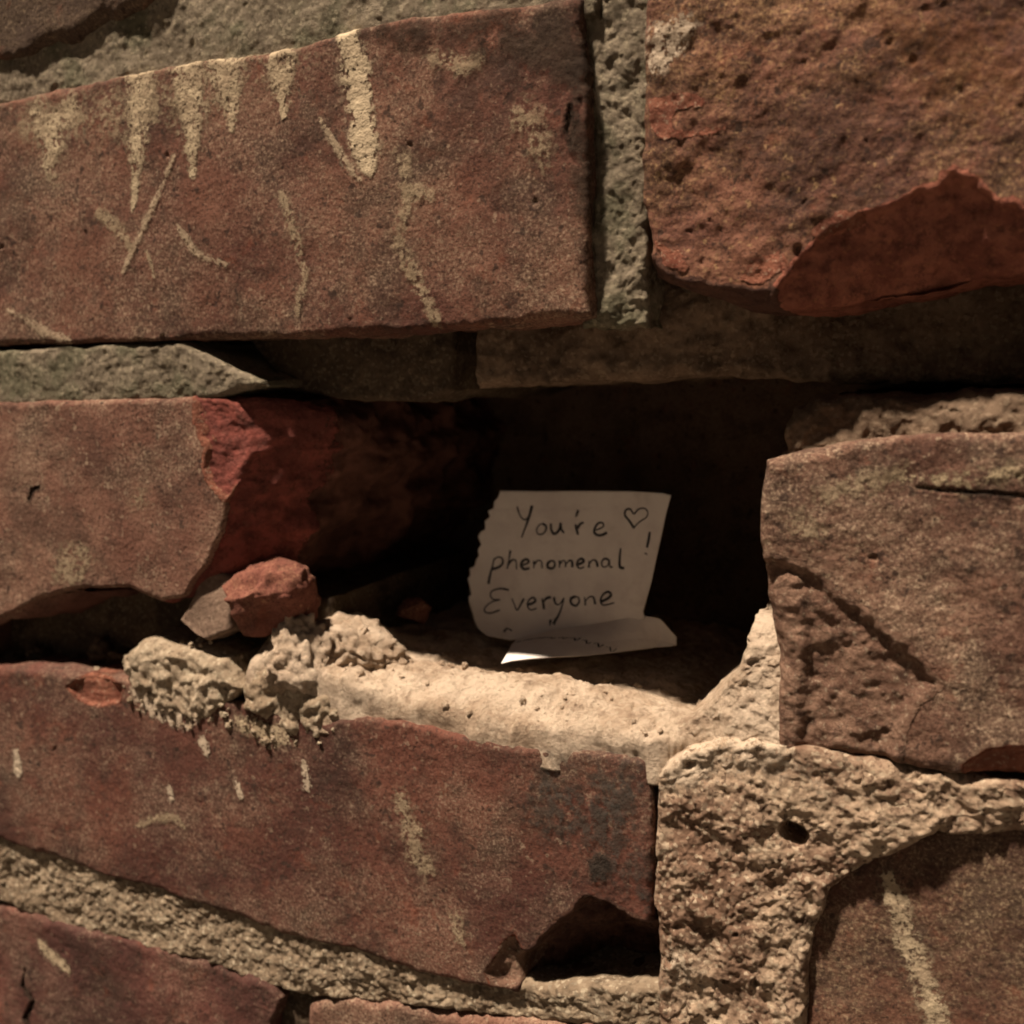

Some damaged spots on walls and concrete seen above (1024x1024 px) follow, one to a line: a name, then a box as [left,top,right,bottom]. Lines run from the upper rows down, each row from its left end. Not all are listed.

peeling [648,92,727,140]
spalling [652,164,1024,317]
spalling [192,396,238,503]
crack [918,487,1024,500]
spalling [484,852,660,992]